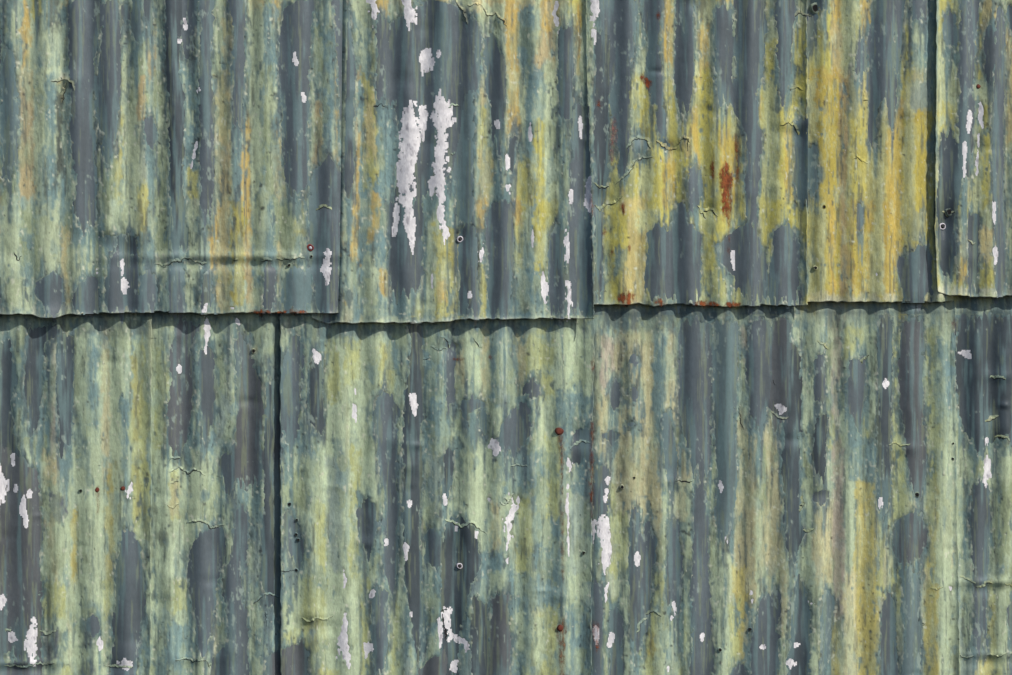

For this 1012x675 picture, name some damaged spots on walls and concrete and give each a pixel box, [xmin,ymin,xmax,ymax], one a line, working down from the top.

peeling [0,0,216,675]
peeling [228,0,246,128]
peeling [187,307,326,675]
peeling [336,613,351,669]
peeling [356,320,516,675]
peeling [366,0,533,326]
peeling [502,493,520,564]
peeling [541,0,696,325]
peeling [566,0,836,675]
rust [710,144,739,219]